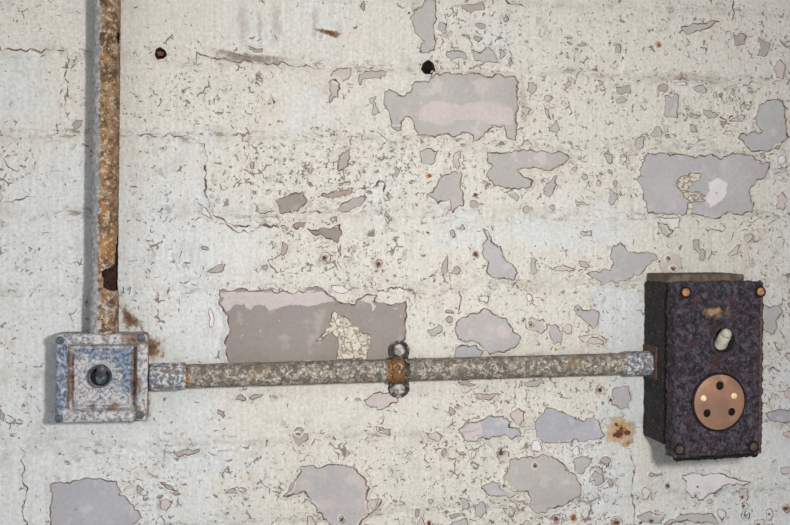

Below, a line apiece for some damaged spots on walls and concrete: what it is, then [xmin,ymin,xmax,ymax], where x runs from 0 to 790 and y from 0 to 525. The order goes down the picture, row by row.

peeling [324,0,790,241]
peeling [203,262,229,276]
peeling [551,238,659,289]
corrosion [119,306,143,330]
corrosion [149,339,164,357]
peeling [205,283,411,363]
peeling [425,293,612,358]
corrosion [607,416,636,447]
peeling [44,473,147,525]
peeling [278,459,399,525]
peeling [424,404,616,525]
peeling [635,467,753,525]